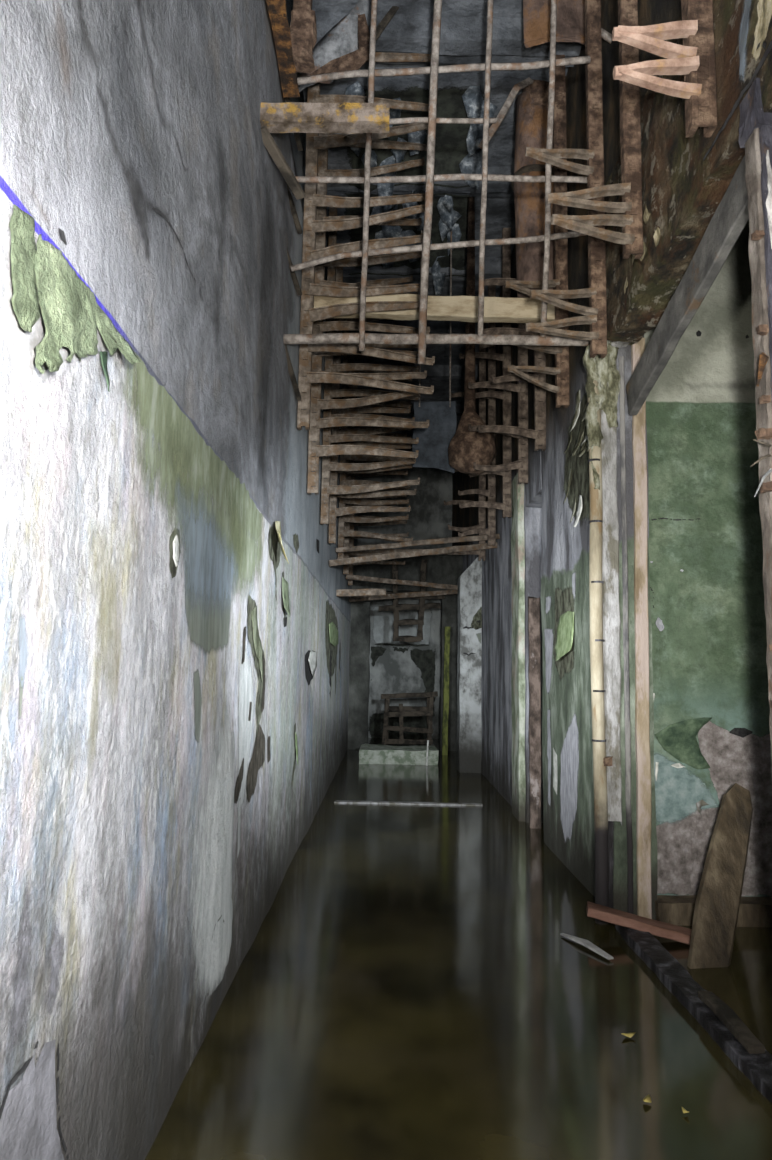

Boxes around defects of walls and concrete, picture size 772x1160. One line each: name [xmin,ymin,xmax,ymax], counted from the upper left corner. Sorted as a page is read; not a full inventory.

crack [140,14,159,110]
crack [102,99,203,299]
peeling [0,204,140,396]
damp [194,670,202,742]
damp [174,447,245,653]
peeling [234,595,271,803]
peeling [269,521,299,627]
peeling [305,600,341,697]
peeling [655,717,772,896]